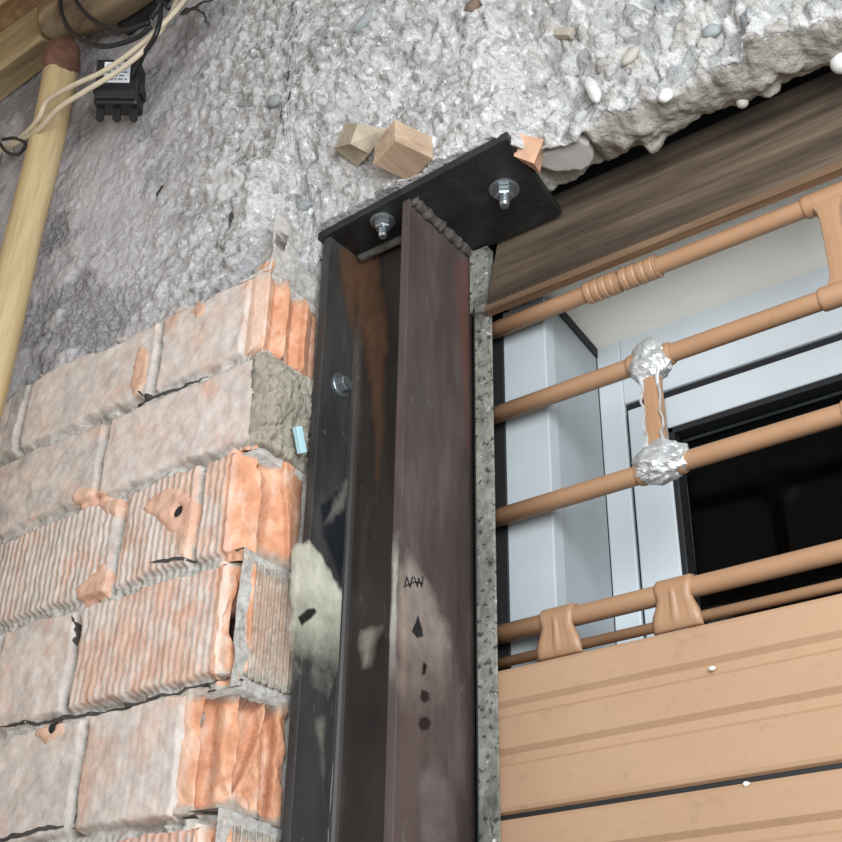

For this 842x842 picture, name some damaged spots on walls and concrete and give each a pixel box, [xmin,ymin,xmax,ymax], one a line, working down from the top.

spalling [661,66,832,148]
spalling [551,145,649,195]
crack [138,376,208,407]
crack [153,556,197,564]
crack [71,615,82,646]
crack [0,677,244,737]
crack [0,791,79,842]